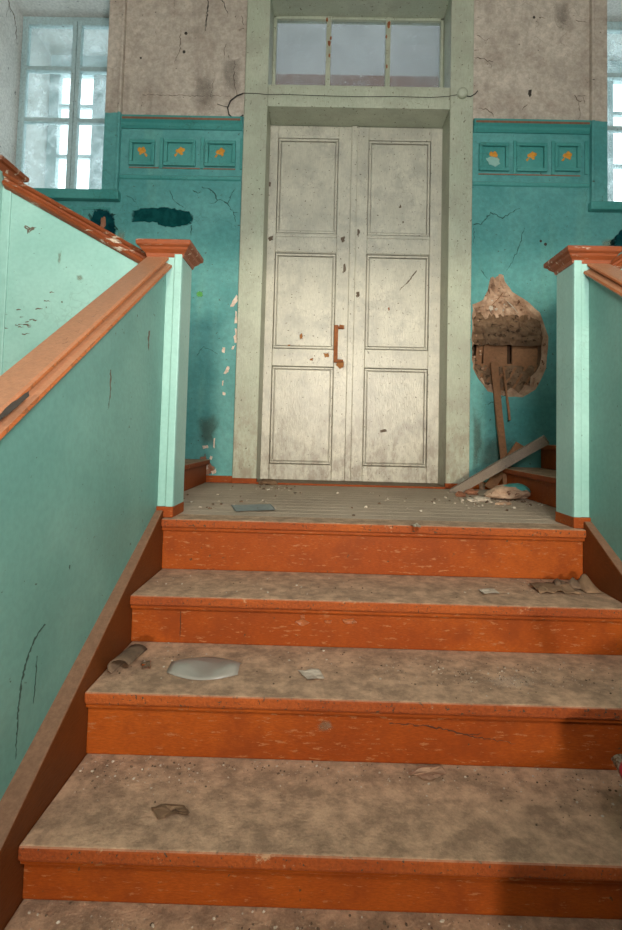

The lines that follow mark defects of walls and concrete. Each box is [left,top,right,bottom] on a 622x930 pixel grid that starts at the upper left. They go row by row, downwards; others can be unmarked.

crack [145,0,244,97]
crack [170,187,237,222]
peeling [222,295,238,353]
spalling [200,438,216,475]